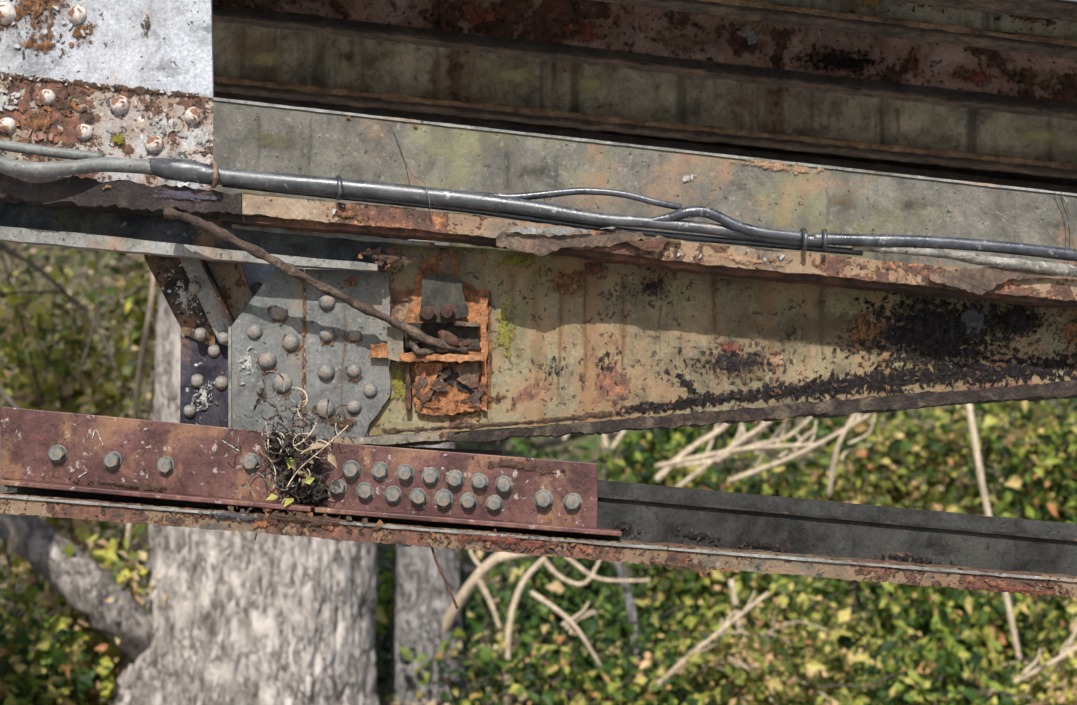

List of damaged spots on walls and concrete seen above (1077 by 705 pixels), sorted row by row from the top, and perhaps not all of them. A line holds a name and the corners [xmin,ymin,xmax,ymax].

corrosion [990,12,1065,27]
corrosion [0,0,200,115]
corrosion [776,40,934,81]
corrosion [382,266,1077,435]
corrosion [608,519,641,538]
corrosion [739,538,788,552]
corrosion [871,552,953,565]